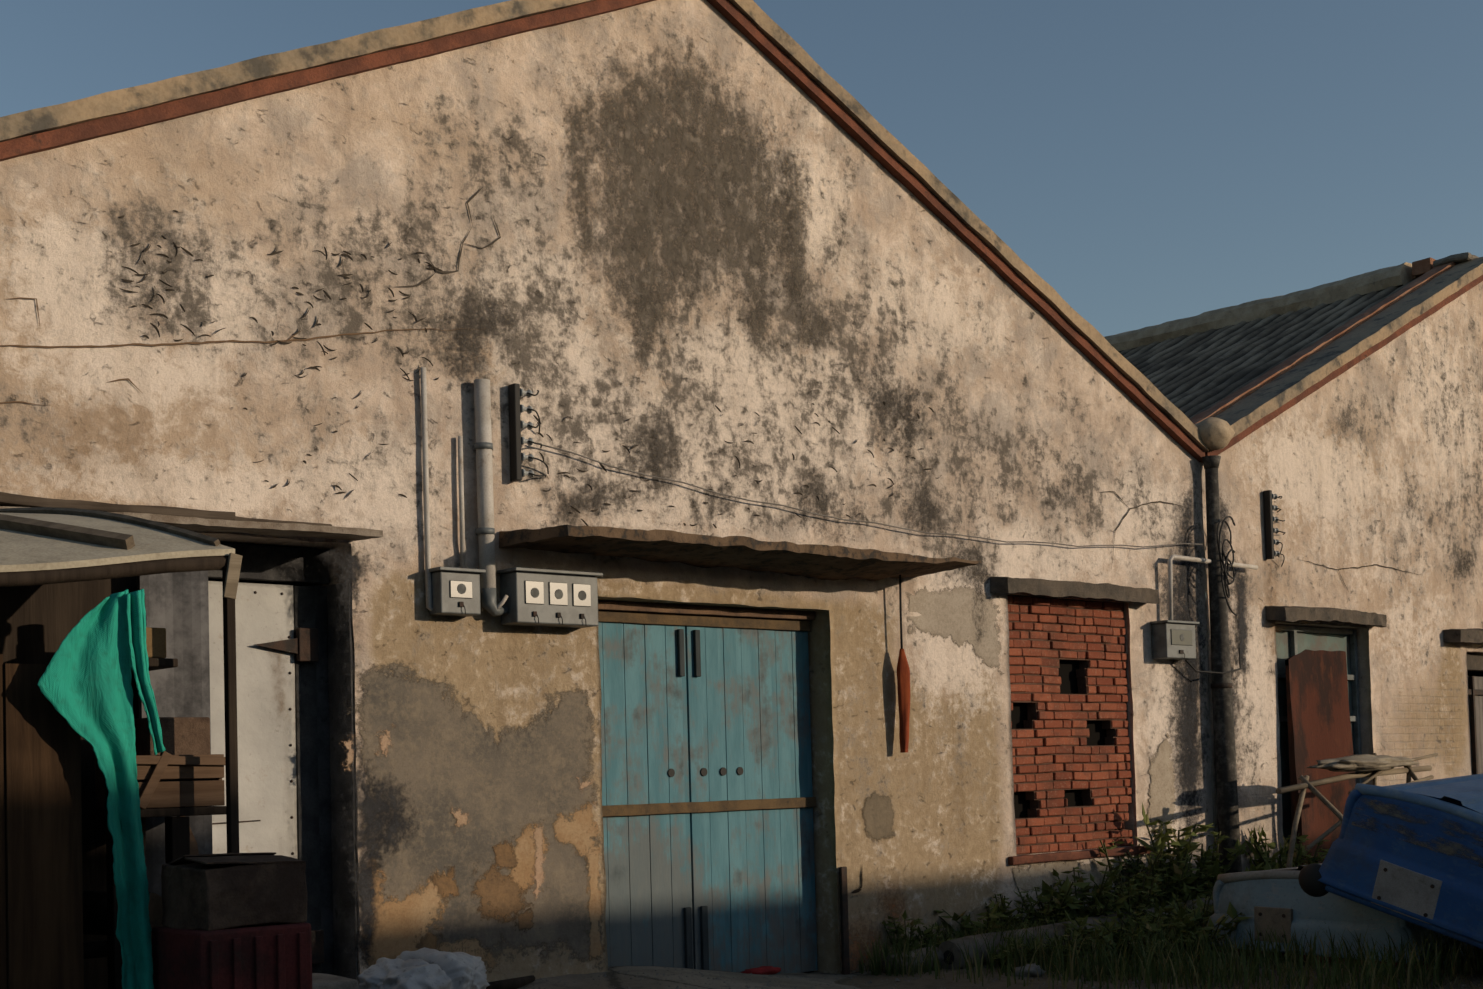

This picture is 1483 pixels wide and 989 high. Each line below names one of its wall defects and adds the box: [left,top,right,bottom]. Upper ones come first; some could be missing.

crack [398,187,501,287]
water stain [564,38,835,370]
crack [0,297,485,390]
crack [0,399,46,407]
mould [856,369,919,449]
mould [693,482,730,517]
mould [792,474,863,537]
peeling [905,584,1004,675]
water stain [1159,474,1206,842]
water stain [1220,497,1248,782]
corrosion [1285,649,1356,865]
peeling [342,662,605,973]